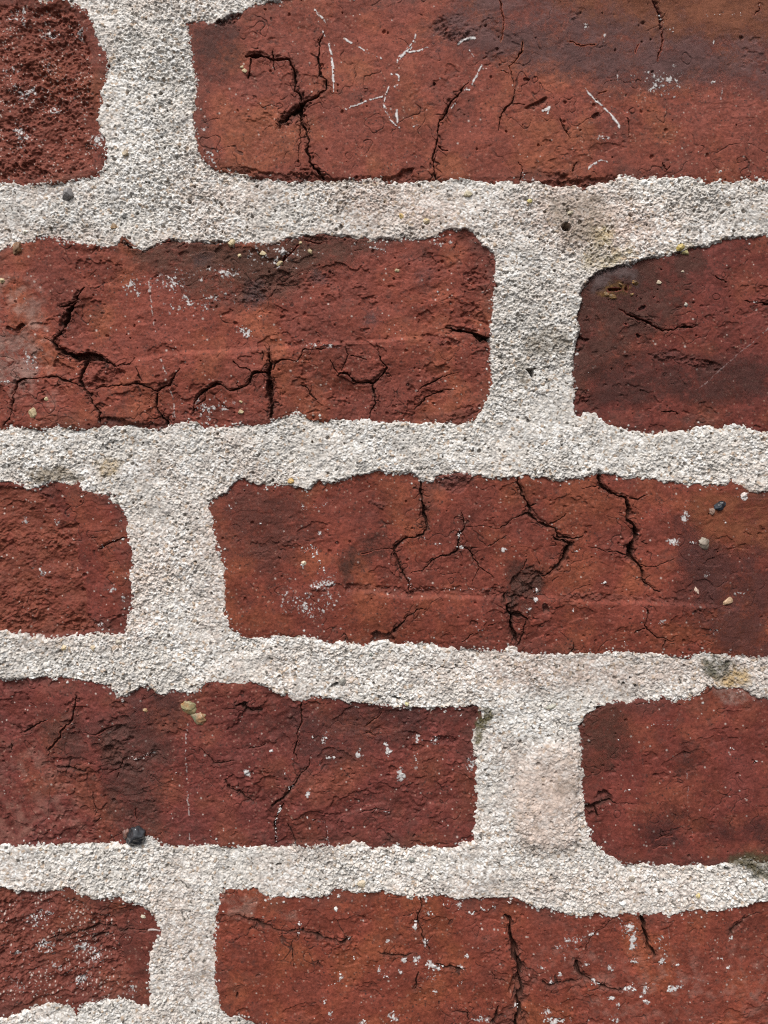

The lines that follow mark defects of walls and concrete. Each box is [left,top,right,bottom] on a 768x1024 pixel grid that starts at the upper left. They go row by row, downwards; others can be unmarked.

crack [243,31,329,182]
crack [431,81,471,181]
crack [496,0,526,132]
crack [558,116,579,173]
crack [634,0,664,62]
crack [1,285,389,428]
crack [413,371,460,412]
crack [443,326,491,345]
crack [358,473,676,674]
crack [234,913,350,971]
crack [377,896,464,991]
crack [450,912,658,1024]